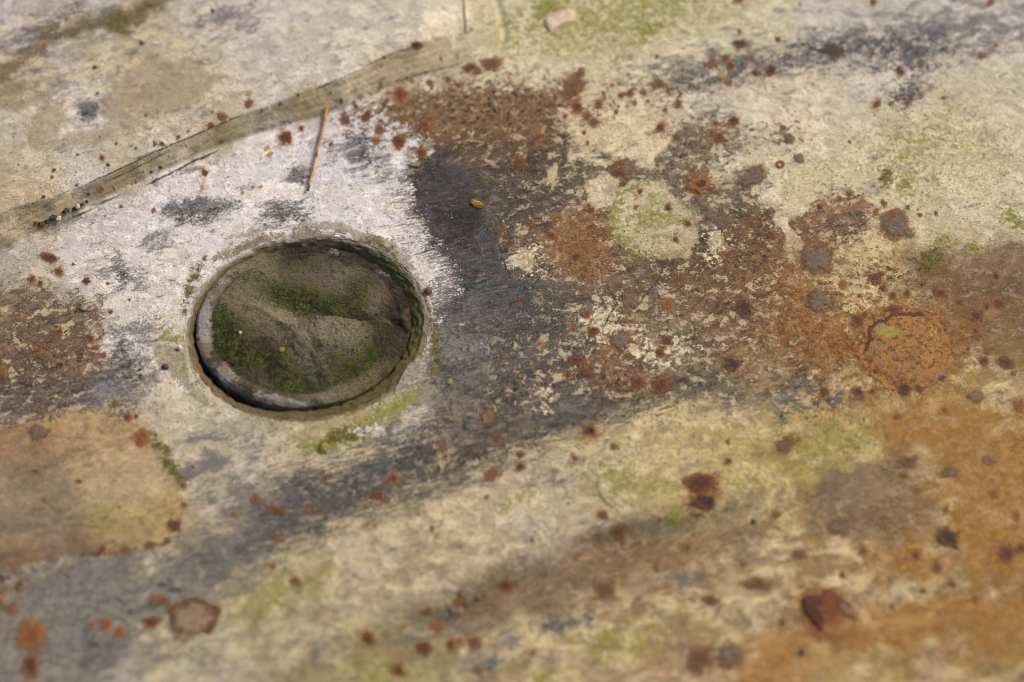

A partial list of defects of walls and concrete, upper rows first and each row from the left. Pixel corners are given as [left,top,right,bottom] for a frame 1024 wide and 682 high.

rust [317,54,810,190]
rust [611,168,643,210]
rust [570,308,599,337]
rust [757,220,1024,402]
rust [654,335,674,358]
rust [565,355,590,381]
rust [631,375,672,393]
rust [804,455,949,561]
rust [992,543,1024,565]
rust [141,594,222,635]